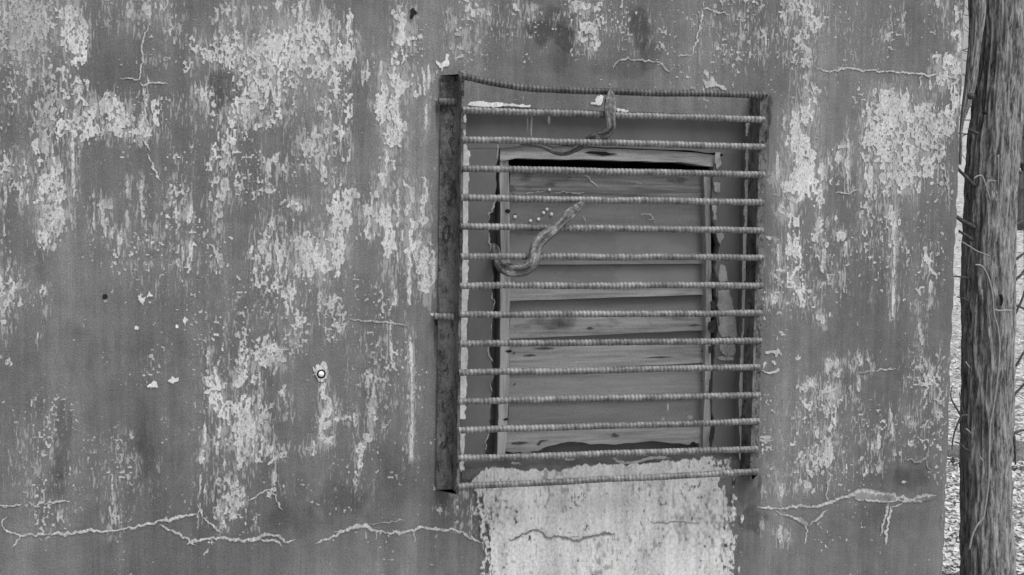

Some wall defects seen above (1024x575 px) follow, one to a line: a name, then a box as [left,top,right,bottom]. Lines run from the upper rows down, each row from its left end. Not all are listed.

crack [816,67,960,90]
peeling [0,0,638,535]
peeling [652,0,963,528]
peeling [2,394,143,571]
crack [0,489,481,548]
crack [510,529,615,542]
crack [757,440,944,544]